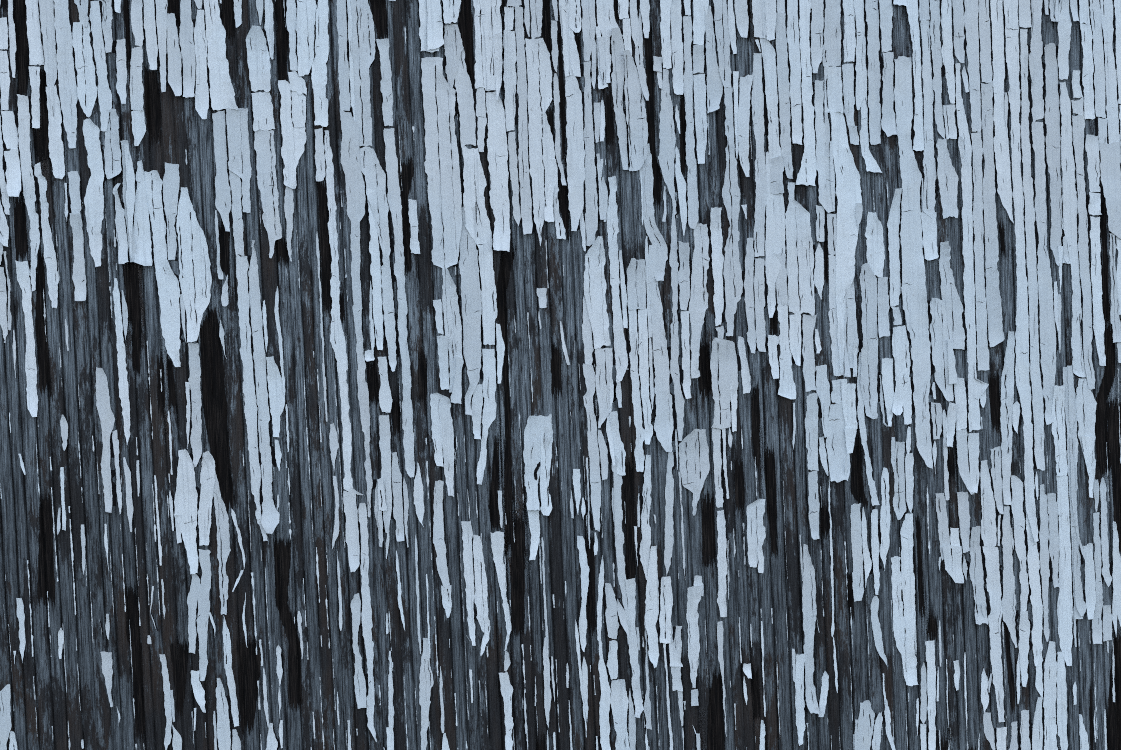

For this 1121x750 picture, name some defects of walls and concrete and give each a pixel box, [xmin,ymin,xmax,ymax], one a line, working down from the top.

peeling [0,0,429,750]
peeling [415,0,1121,750]